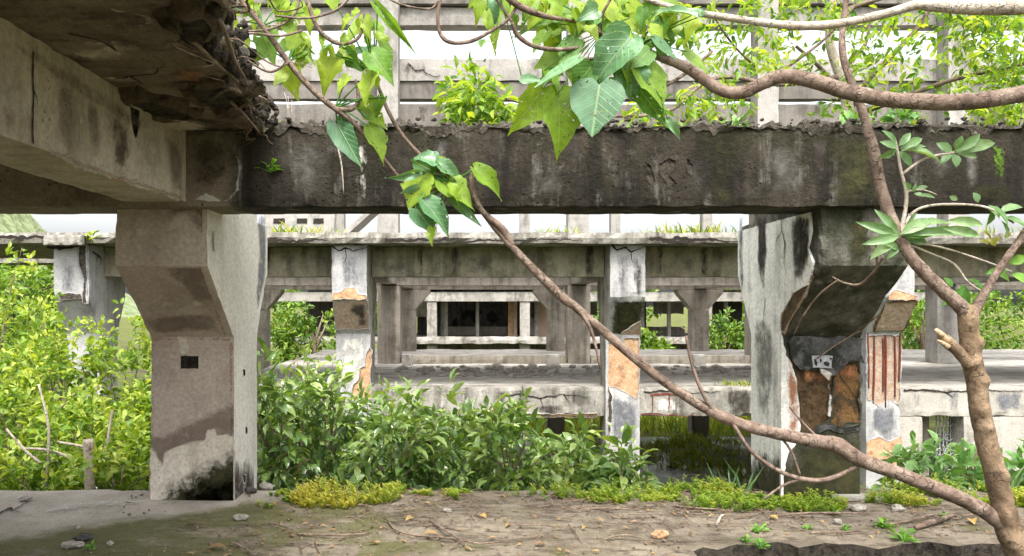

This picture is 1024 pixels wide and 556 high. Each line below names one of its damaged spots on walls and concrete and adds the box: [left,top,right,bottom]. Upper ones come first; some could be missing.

crack [31,51,39,144]
spalling [118,0,280,141]
water stain [757,218,766,282]
water stain [792,218,808,276]
spalling [332,286,370,330]
spalling [781,275,814,334]
spalling [351,347,373,400]
crack [506,393,587,407]
spalling [519,321,642,436]
spalling [795,289,918,434]
spalling [866,436,902,465]